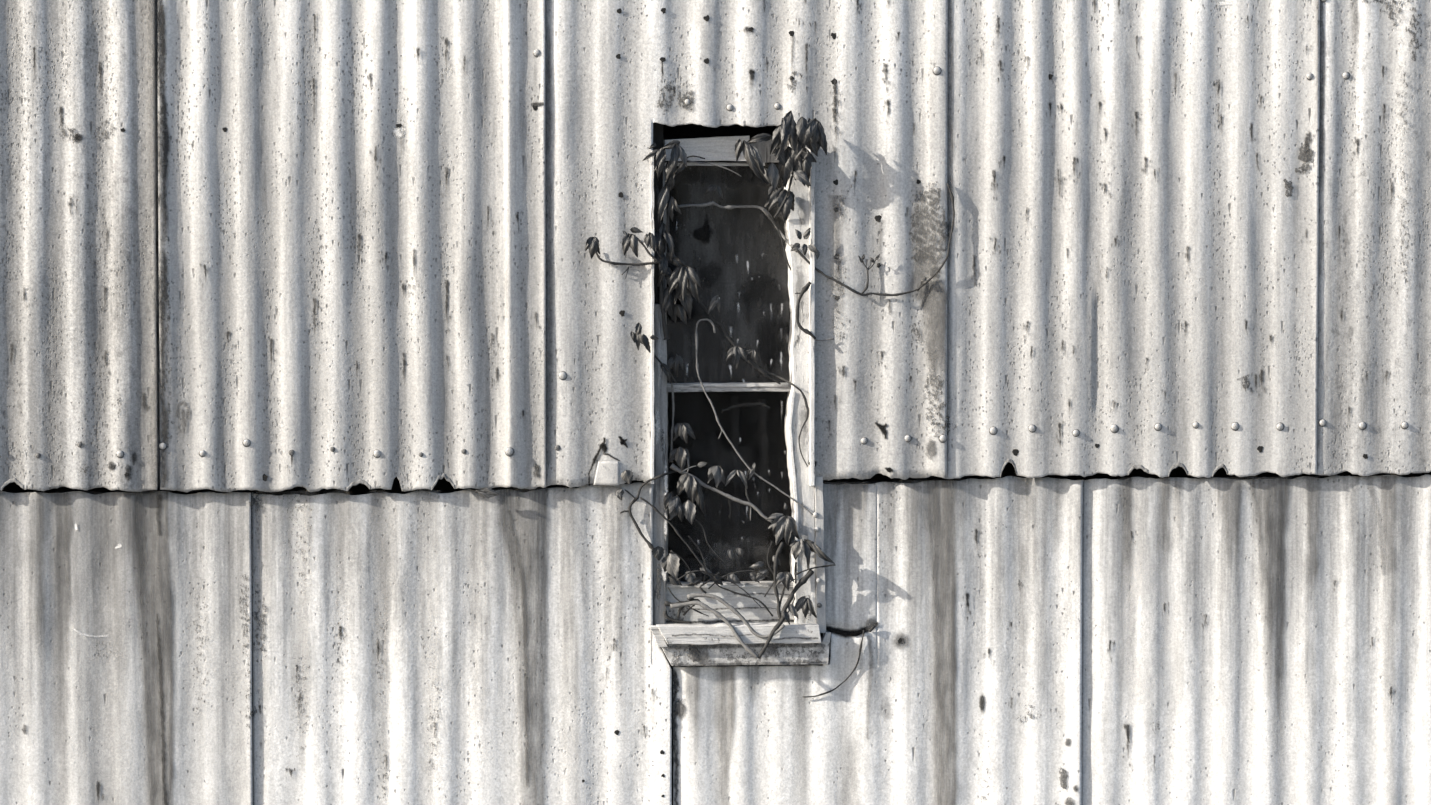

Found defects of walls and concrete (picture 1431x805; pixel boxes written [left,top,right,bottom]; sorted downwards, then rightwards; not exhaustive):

corrosion [1283,1,1325,197]
corrosion [1351,0,1427,151]
corrosion [909,0,956,458]
corrosion [1391,171,1413,282]
damp [135,491,173,805]
damp [929,480,956,805]
damp [1236,477,1288,673]
damp [1307,477,1317,573]